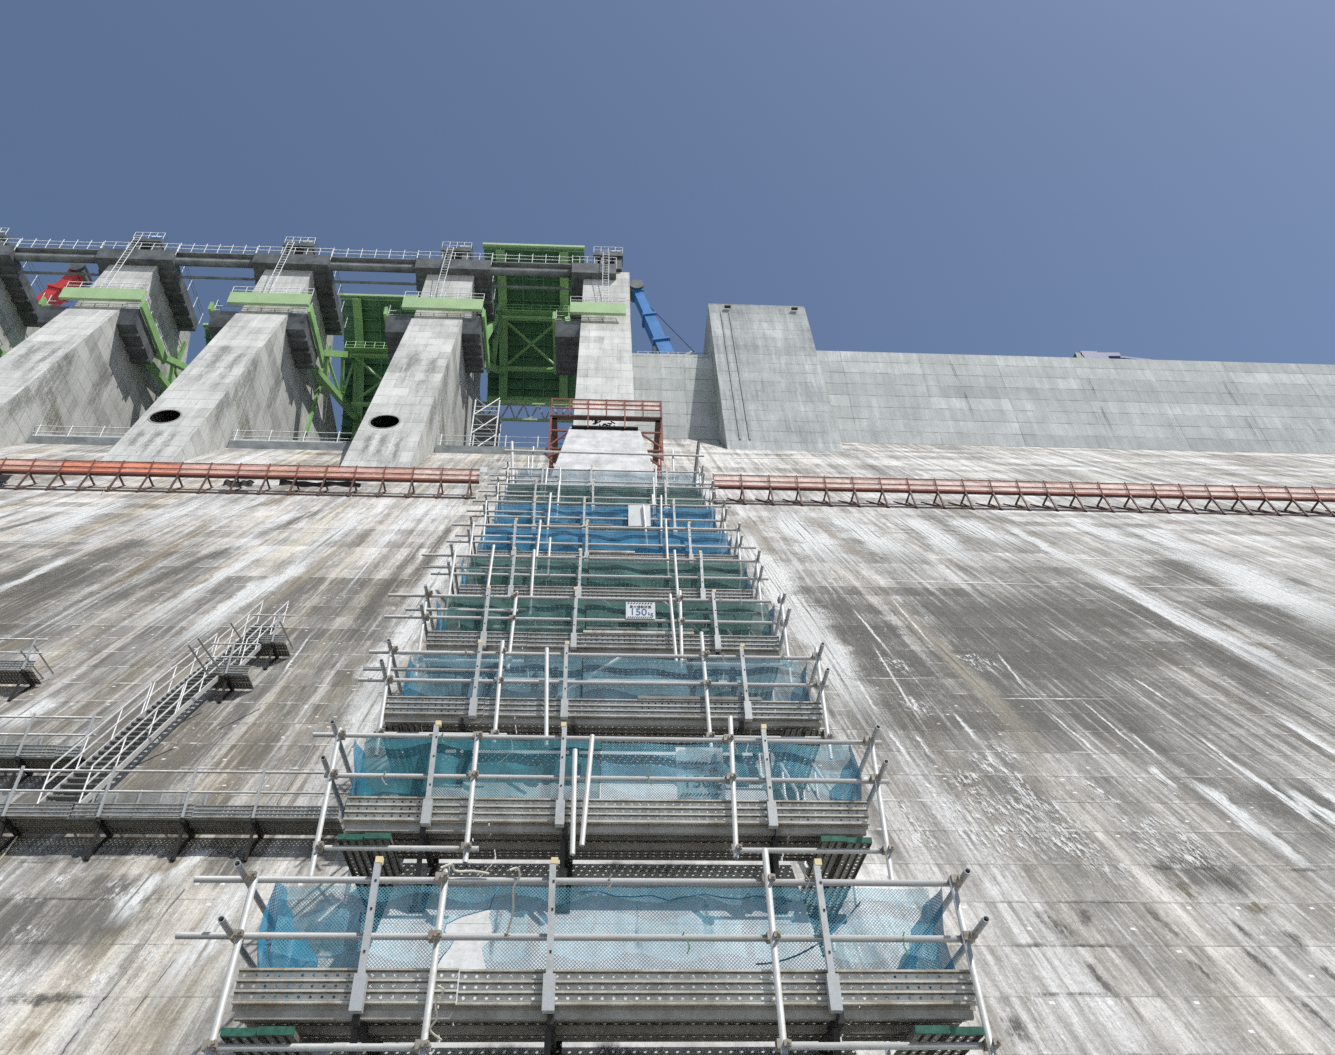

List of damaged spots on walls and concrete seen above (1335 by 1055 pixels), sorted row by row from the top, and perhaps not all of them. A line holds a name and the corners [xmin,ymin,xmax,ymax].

damp [0,495,207,629]
damp [108,511,368,699]
damp [0,698,61,726]
damp [732,515,1335,871]
damp [0,843,260,992]
damp [9,992,80,1004]